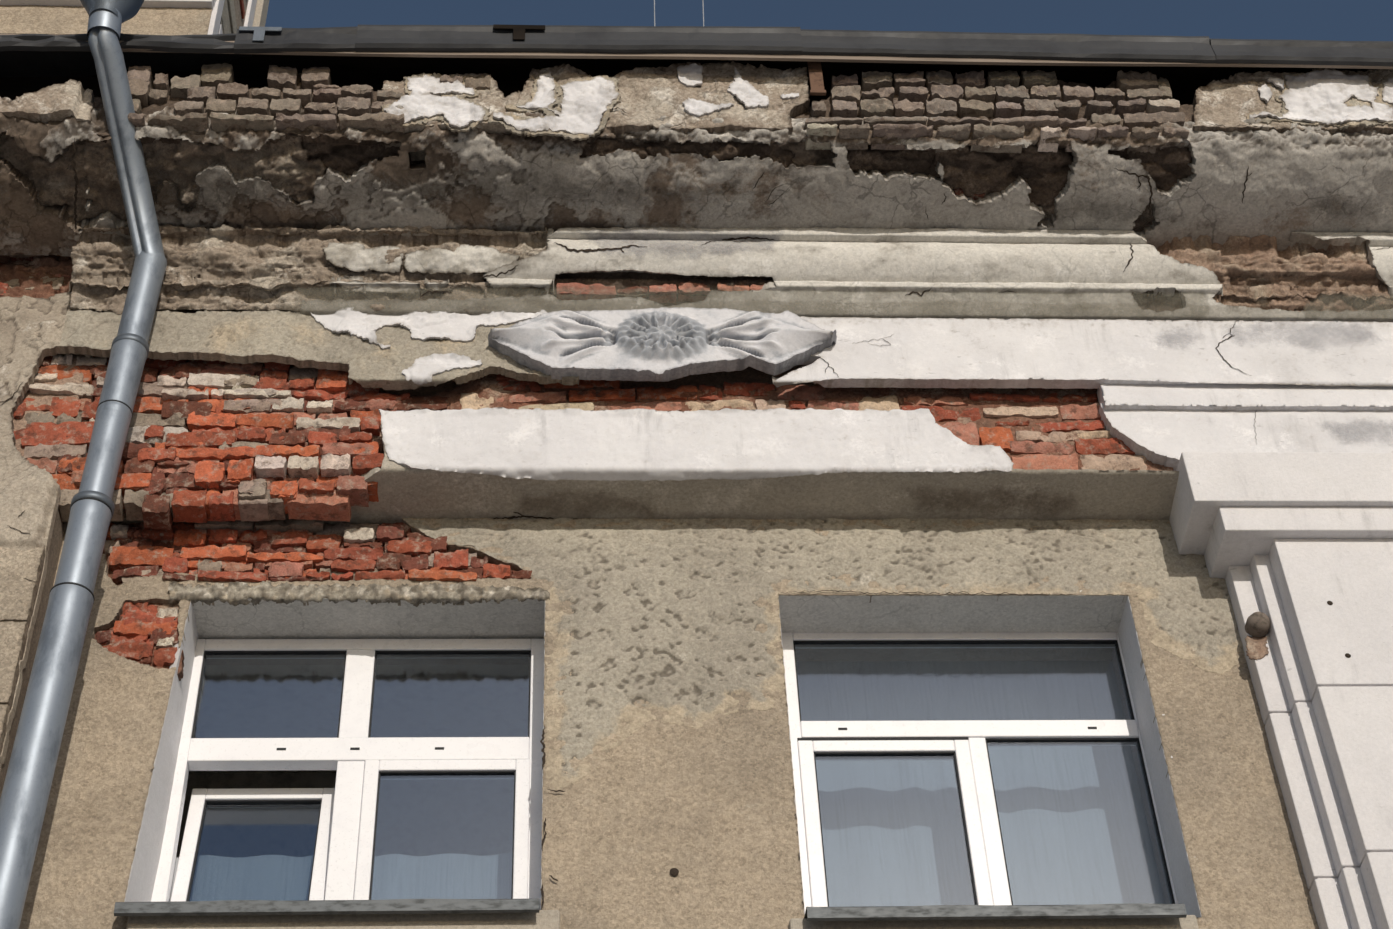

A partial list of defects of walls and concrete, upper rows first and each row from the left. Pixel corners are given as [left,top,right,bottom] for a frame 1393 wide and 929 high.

flaking render [127,63,621,146]
flaking render [677,63,1194,154]
peeling [1246,68,1393,130]
flaking render [0,254,73,299]
spalling [0,131,111,222]
crack [554,242,646,252]
crack [1114,168,1153,272]
spalling [1132,203,1155,232]
crack [1216,321,1246,374]
flaking render [13,354,109,522]
peeling [95,272,1269,790]